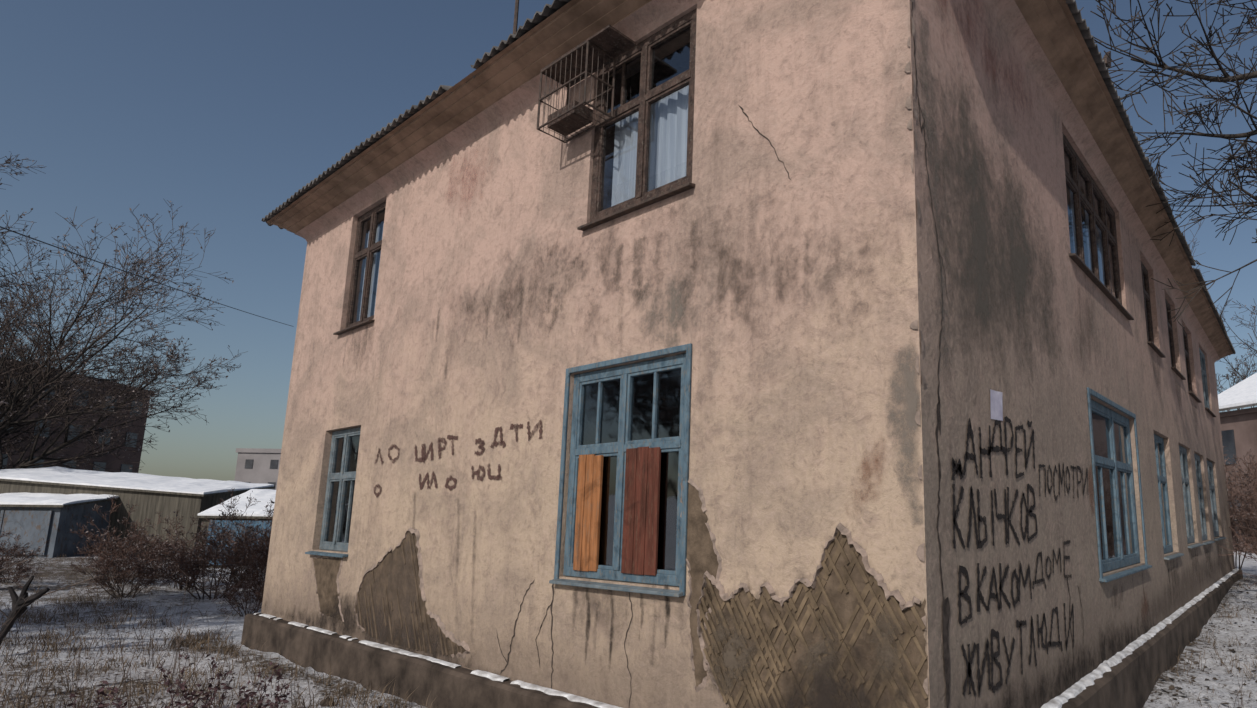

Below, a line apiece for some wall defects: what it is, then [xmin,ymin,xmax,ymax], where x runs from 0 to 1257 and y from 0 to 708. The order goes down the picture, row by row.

flaking render [680,478,928,708]